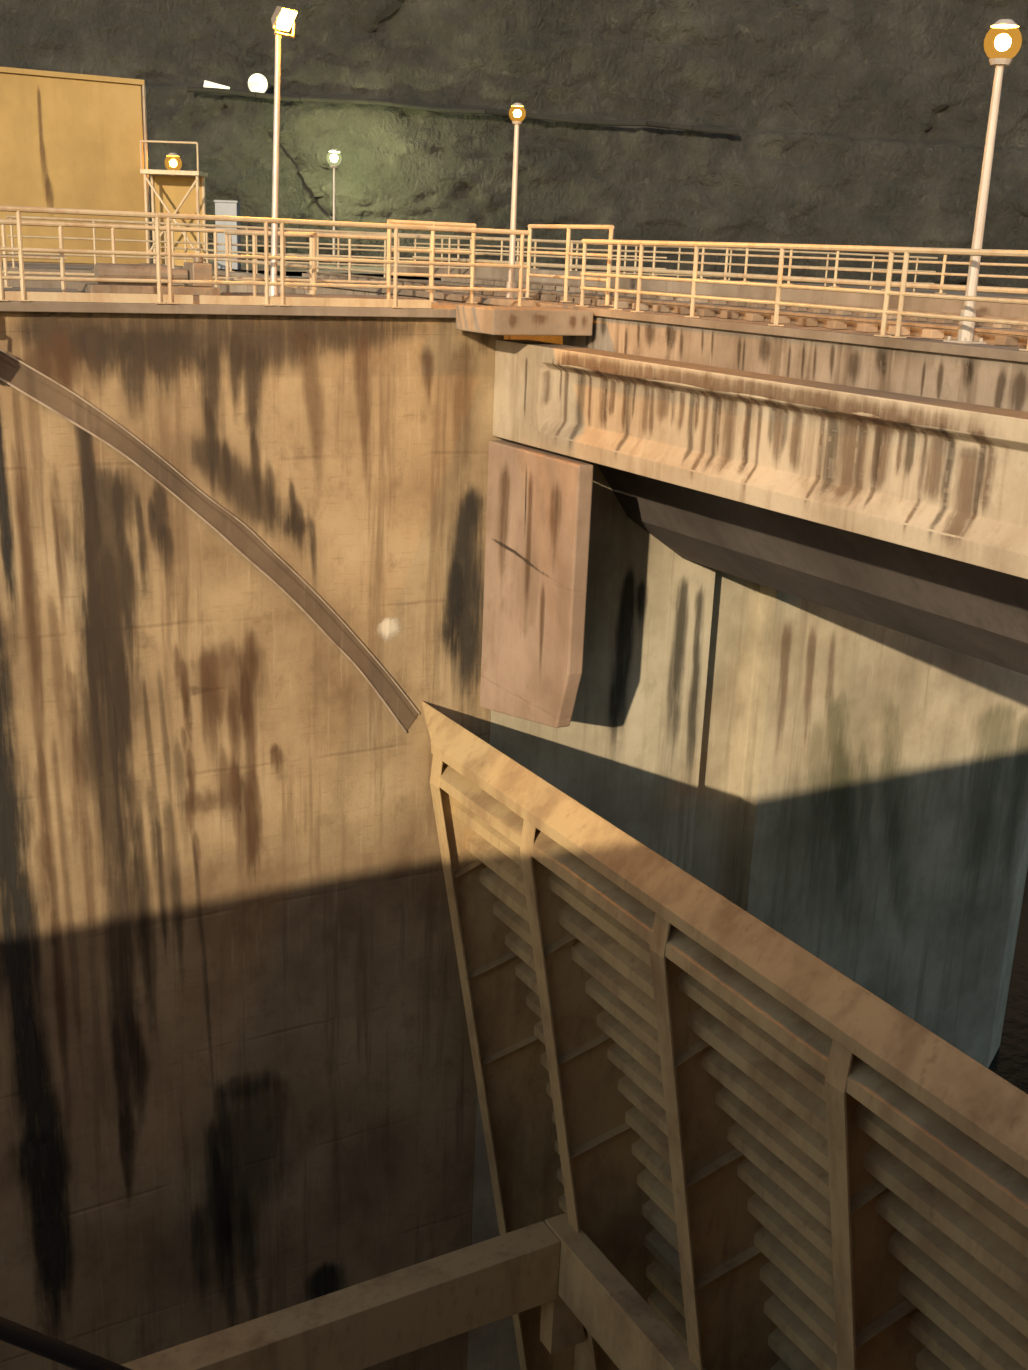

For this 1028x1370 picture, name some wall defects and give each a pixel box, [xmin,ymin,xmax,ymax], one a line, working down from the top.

damp [0,423,13,597]
damp [443,490,483,684]
damp [610,571,645,733]
damp [672,584,702,745]
damp [546,318,992,534]
damp [995,373,1025,411]
damp [0,628,72,1327]